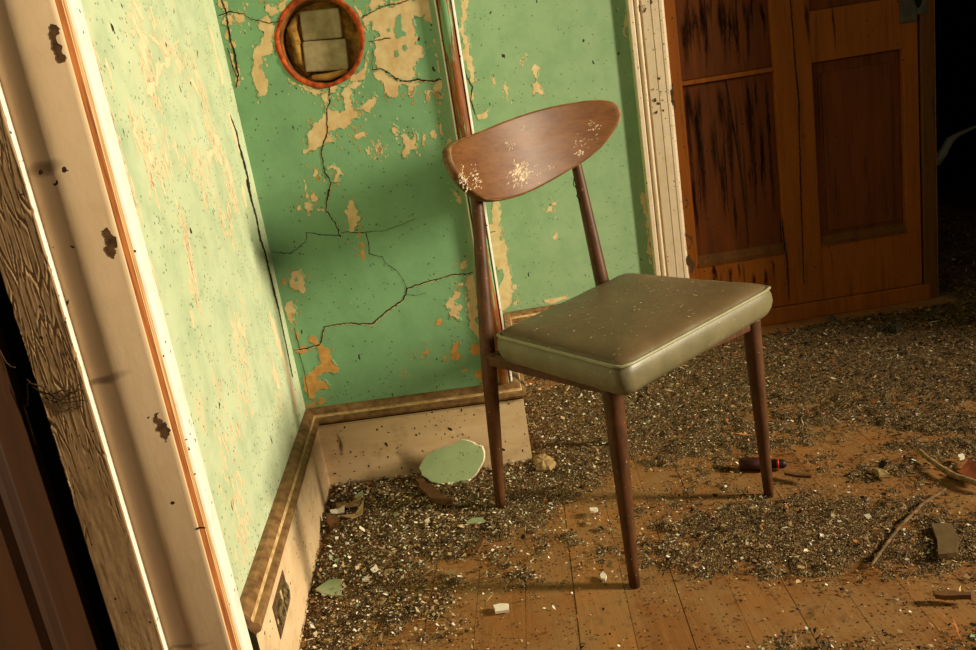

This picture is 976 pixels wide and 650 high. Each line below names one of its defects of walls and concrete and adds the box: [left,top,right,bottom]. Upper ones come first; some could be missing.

peeling [49,24,67,63]
crack [218,0,284,88]
peeling [287,0,451,259]
crack [369,38,441,83]
peeling [459,0,491,121]
peeling [519,47,545,108]
peeling [266,269,339,418]
crack [230,88,473,393]
peeling [427,254,483,383]
peeling [489,201,519,312]
peeling [540,295,569,304]
peeling [155,413,171,441]